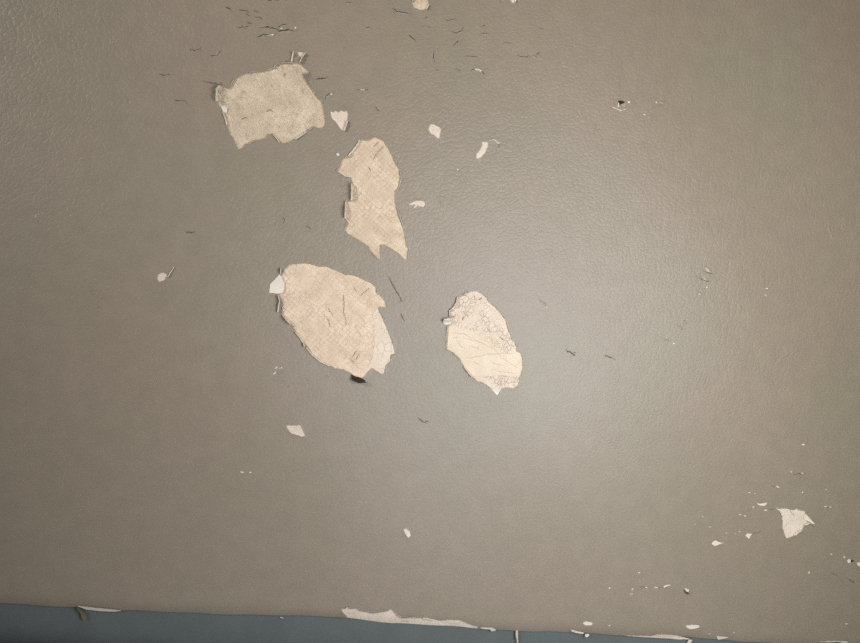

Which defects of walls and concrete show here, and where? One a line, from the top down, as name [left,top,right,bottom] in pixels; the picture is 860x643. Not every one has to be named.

peeling [411,0,430,10]
peeling [216,51,348,149]
peeling [427,124,441,138]
peeling [476,139,500,159]
peeling [336,137,409,260]
peeling [269,263,396,383]
peeling [443,291,523,395]
peeling [286,425,305,437]
peeling [739,492,814,538]
peeling [341,606,478,628]